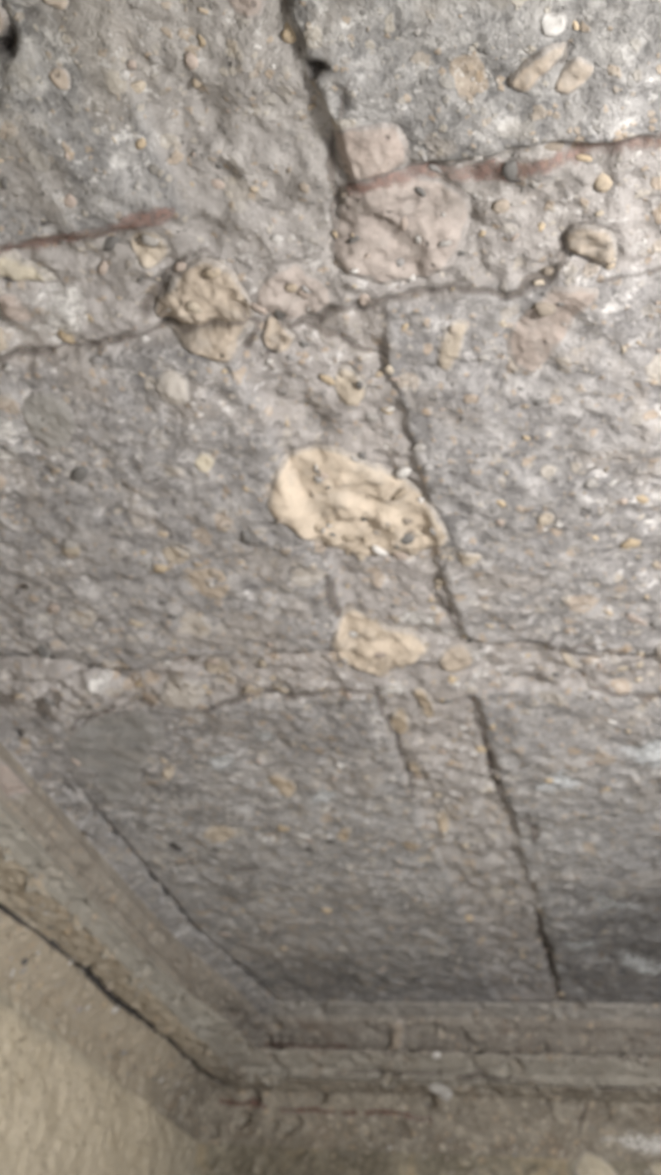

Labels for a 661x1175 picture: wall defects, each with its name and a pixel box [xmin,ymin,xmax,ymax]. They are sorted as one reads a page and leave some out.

crack [328,96,345,225]
corrosion [345,136,661,194]
corrosion [0,208,174,252]
crack [0,240,567,362]
crack [326,575,341,615]
crack [436,595,480,642]
crack [513,640,626,654]
crack [588,682,661,700]
crack [71,689,414,799]
crack [473,710,501,795]
crack [0,904,227,1085]
crack [537,913,564,1000]